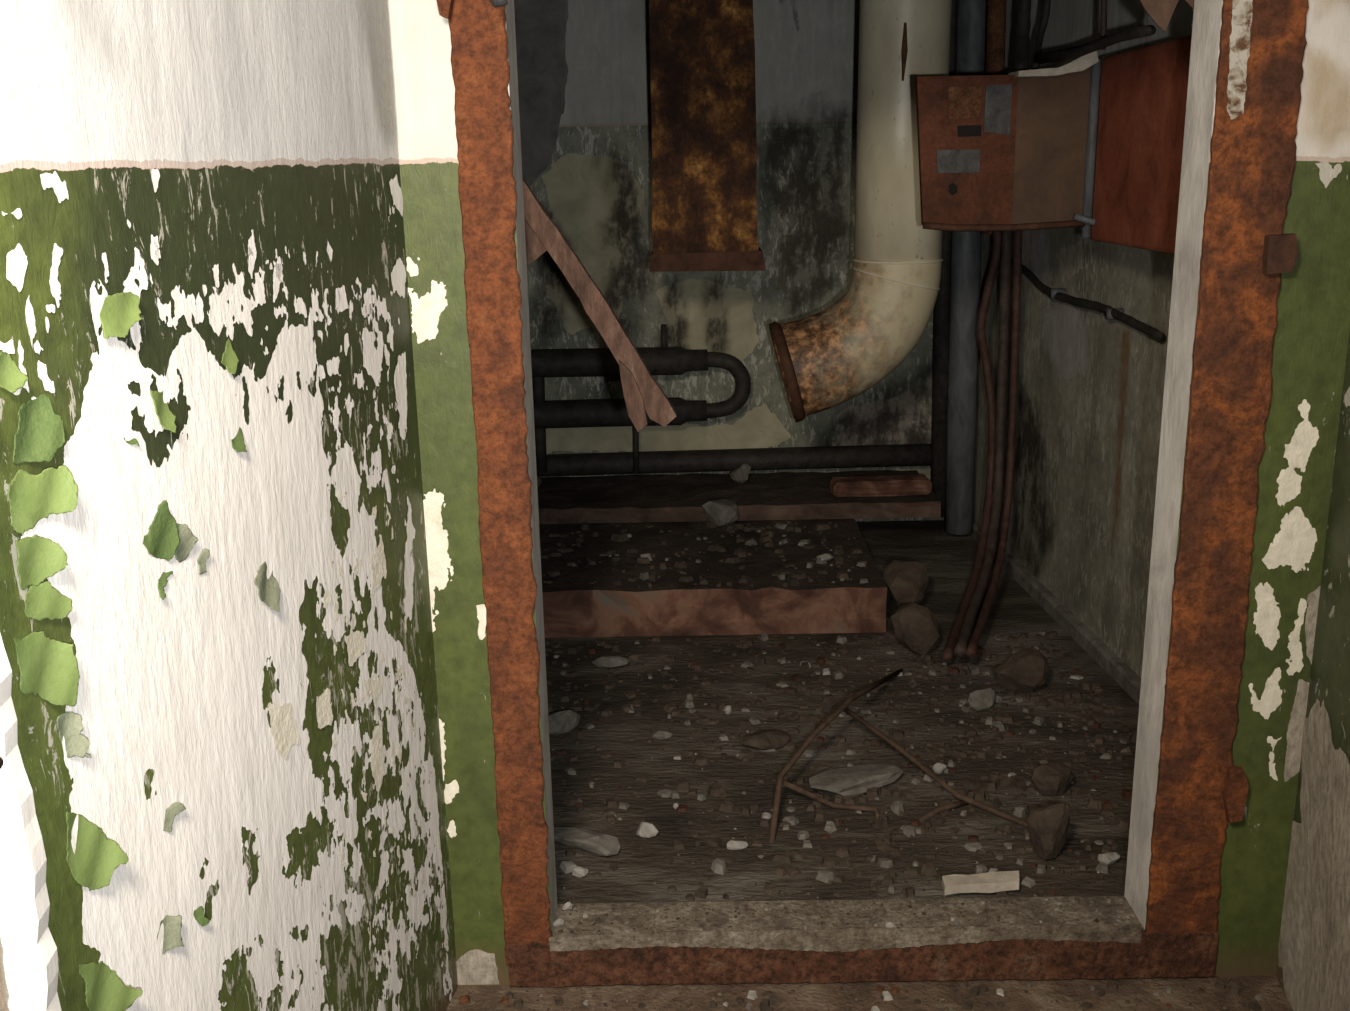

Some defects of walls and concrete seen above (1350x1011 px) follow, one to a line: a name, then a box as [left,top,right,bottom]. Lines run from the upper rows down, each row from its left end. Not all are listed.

peeling [40,171,69,203]
peeling [151,169,160,193]
peeling [388,175,403,227]
leakage [605,155,650,329]
leakage [765,113,848,314]
peeling [1315,161,1342,188]
leakage [538,251,564,337]
leakage [822,366,933,446]
peeling [0,230,499,1011]
peeling [1248,399,1350,1011]